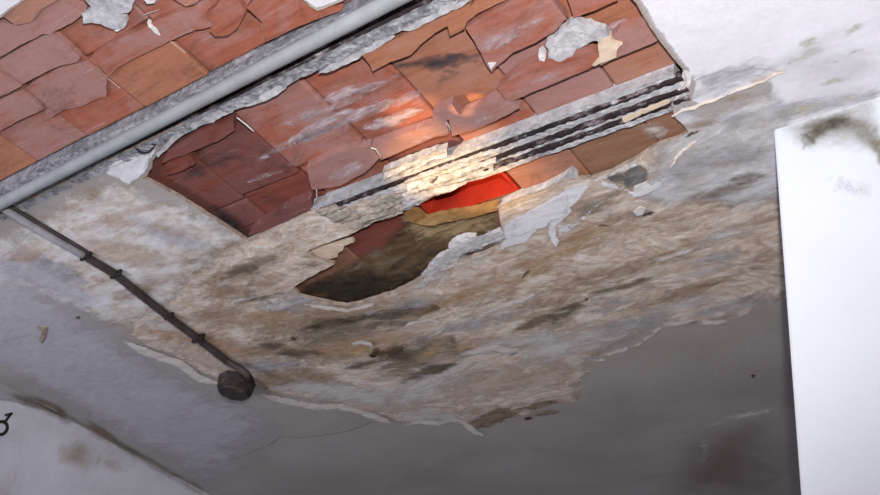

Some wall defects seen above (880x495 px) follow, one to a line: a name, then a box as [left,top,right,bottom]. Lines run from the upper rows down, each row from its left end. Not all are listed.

damp [781,101,880,160]
flaking render [42,0,786,436]
damp [510,195,613,244]
peeling [0,224,260,478]
damp [0,383,66,416]
damp [469,401,558,429]
damp [94,426,149,460]